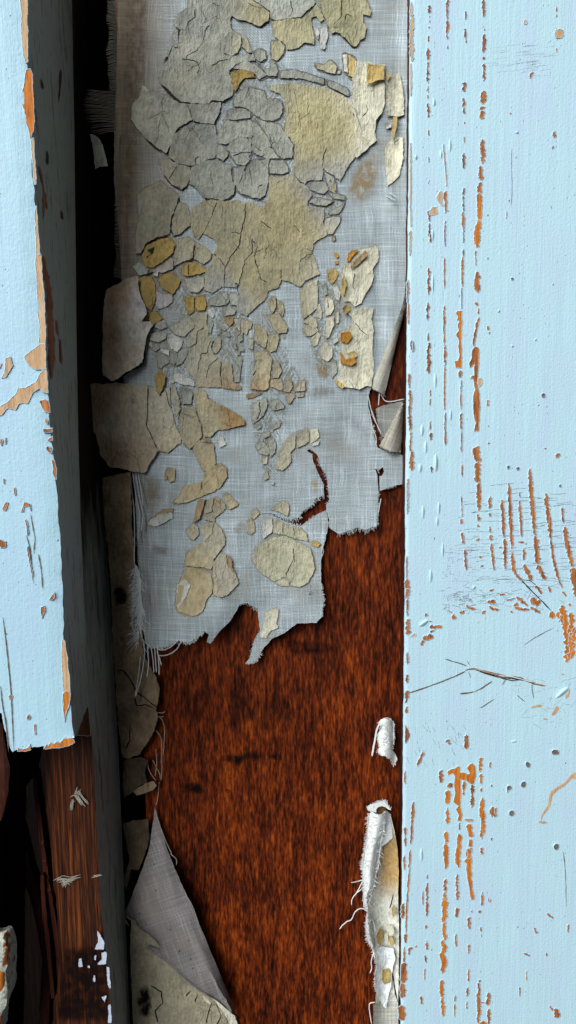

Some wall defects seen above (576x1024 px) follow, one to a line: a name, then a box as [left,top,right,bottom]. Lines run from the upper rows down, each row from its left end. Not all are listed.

crack [135,9,311,294]
crack [333,2,356,48]
crack [324,78,399,145]
peeling [479,0,487,119]
peeling [0,0,63,480]
crack [114,311,157,382]
crack [189,330,230,423]
peeling [90,0,432,616]
peeling [404,137,576,675]
peeling [61,639,71,722]
peeling [397,757,515,1024]
peeling [130,919,238,1024]